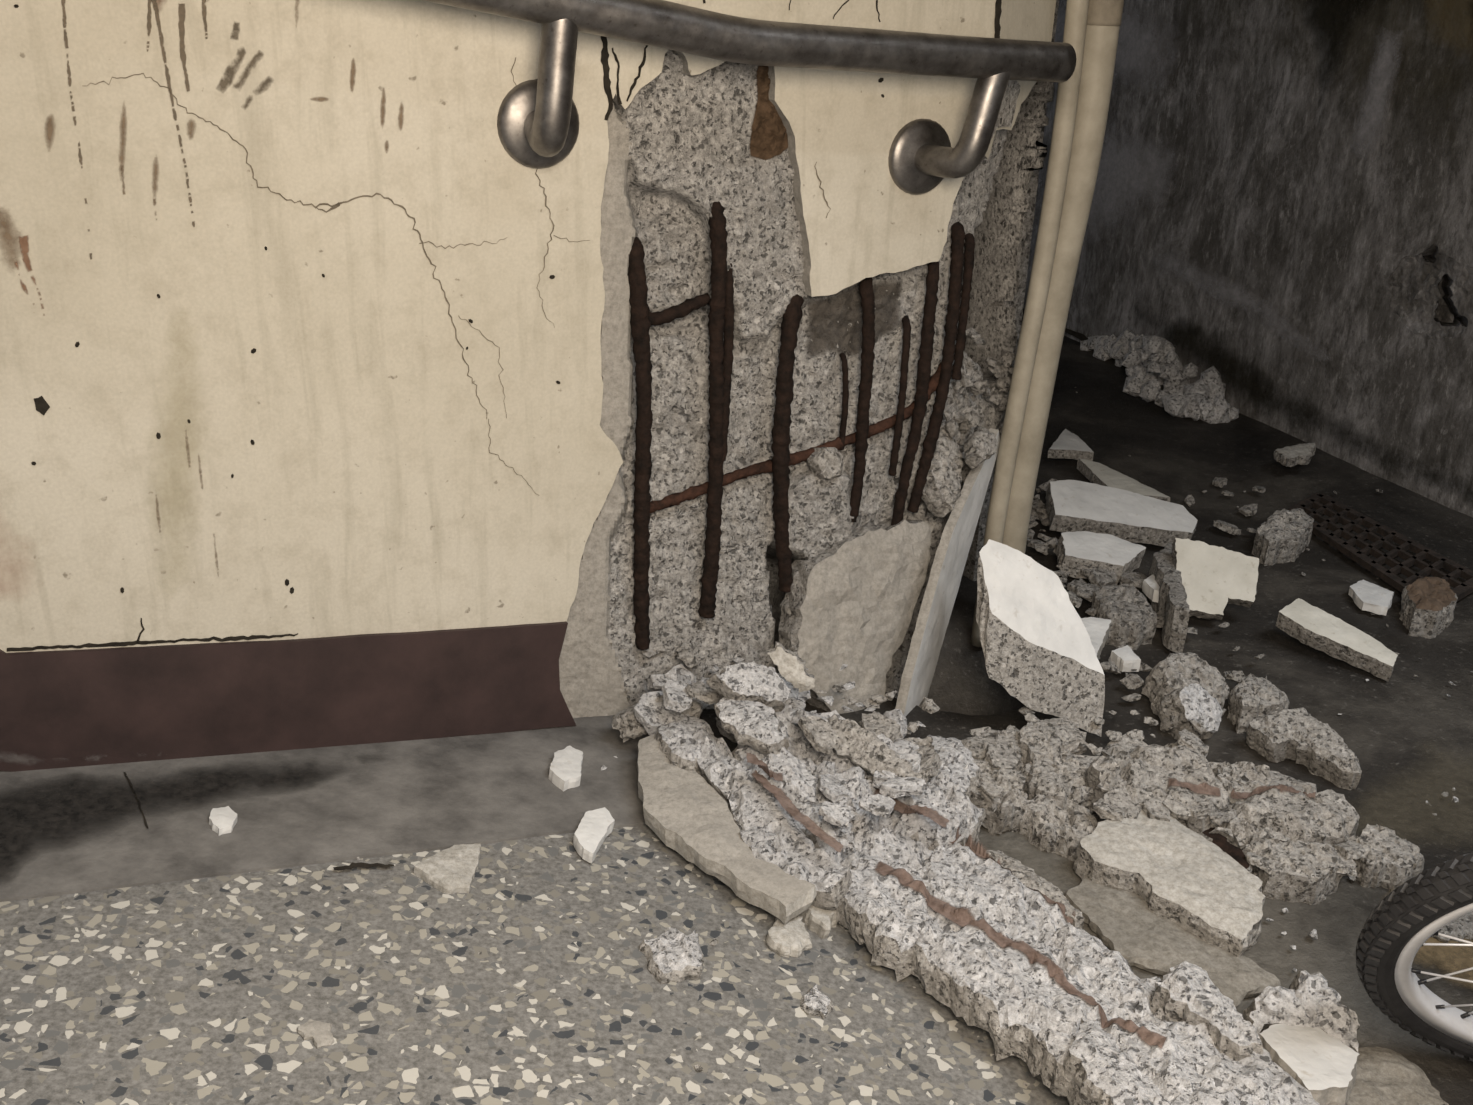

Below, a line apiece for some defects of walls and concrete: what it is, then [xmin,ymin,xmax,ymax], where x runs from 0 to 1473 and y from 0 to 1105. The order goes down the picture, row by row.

crack [833,0,881,22]
crack [994,0,1002,38]
rust [750,66,788,160]
crack [87,73,540,496]
flaking render [1389,244,1473,340]
spalling [559,50,1054,718]